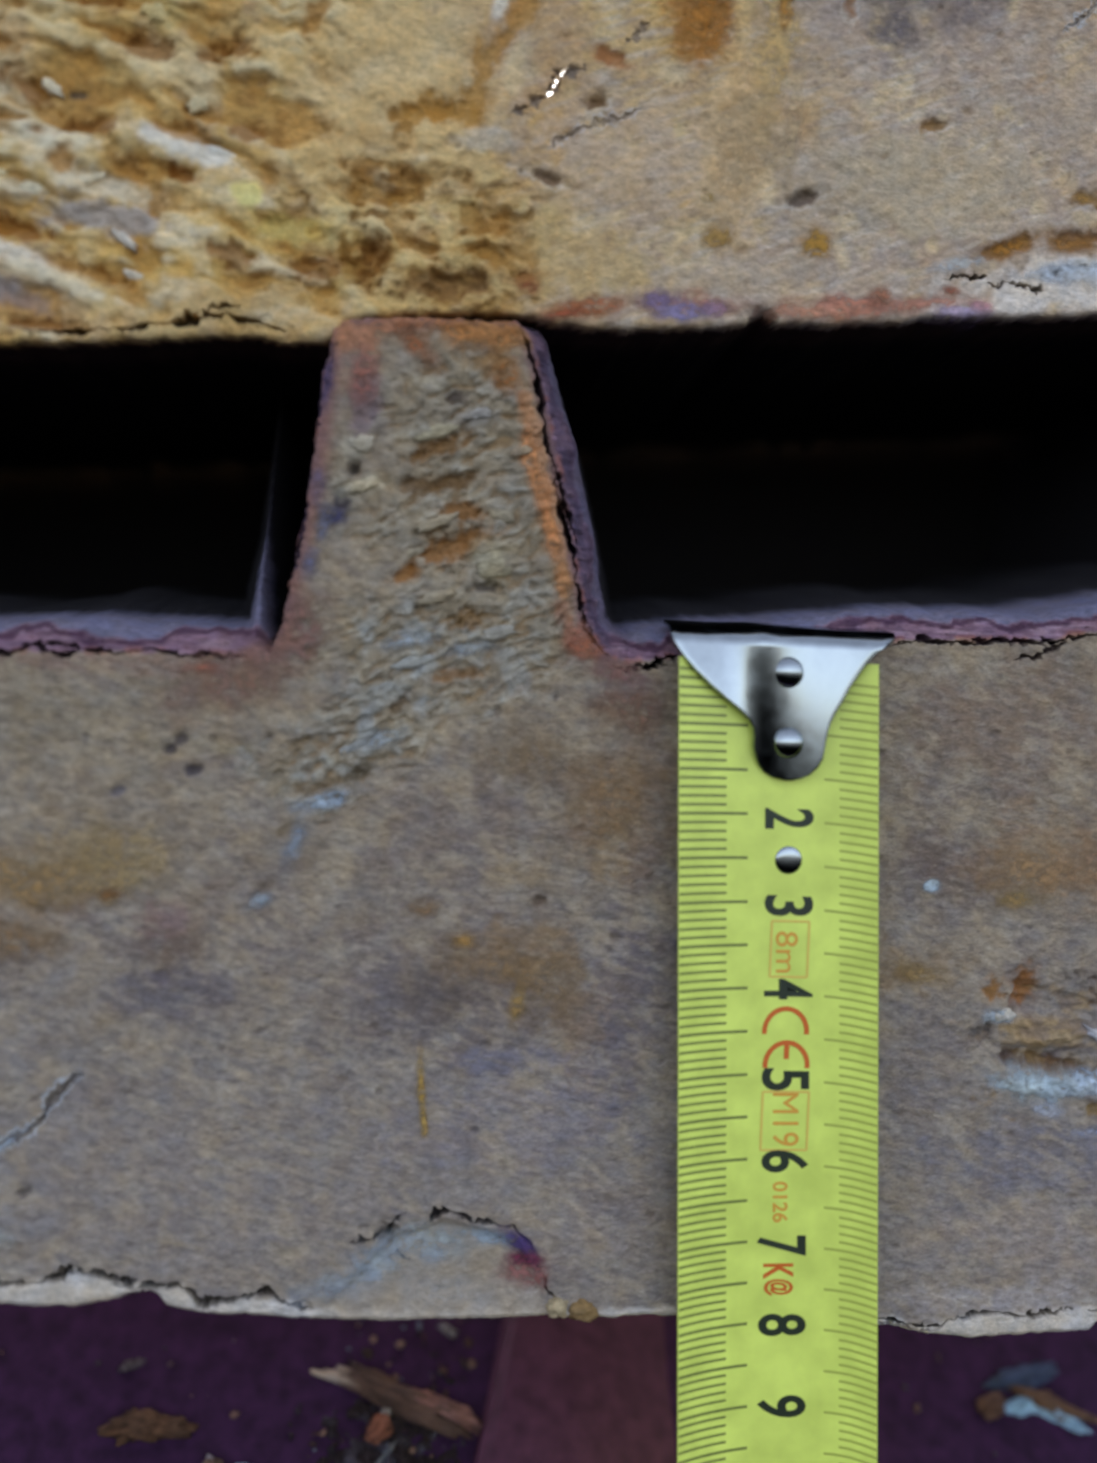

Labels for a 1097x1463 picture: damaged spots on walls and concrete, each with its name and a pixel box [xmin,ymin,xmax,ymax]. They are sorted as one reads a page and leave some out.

crack [1054,0,1097,40]
crack [494,12,662,158]
spalling [581,89,608,111]
spalling [0,0,568,366]
spalling [239,328,582,840]
spalling [162,732,203,777]
spalling [951,959,1097,1117]
crack [0,1064,93,1160]
crack [0,1256,322,1317]
crack [338,1200,561,1303]